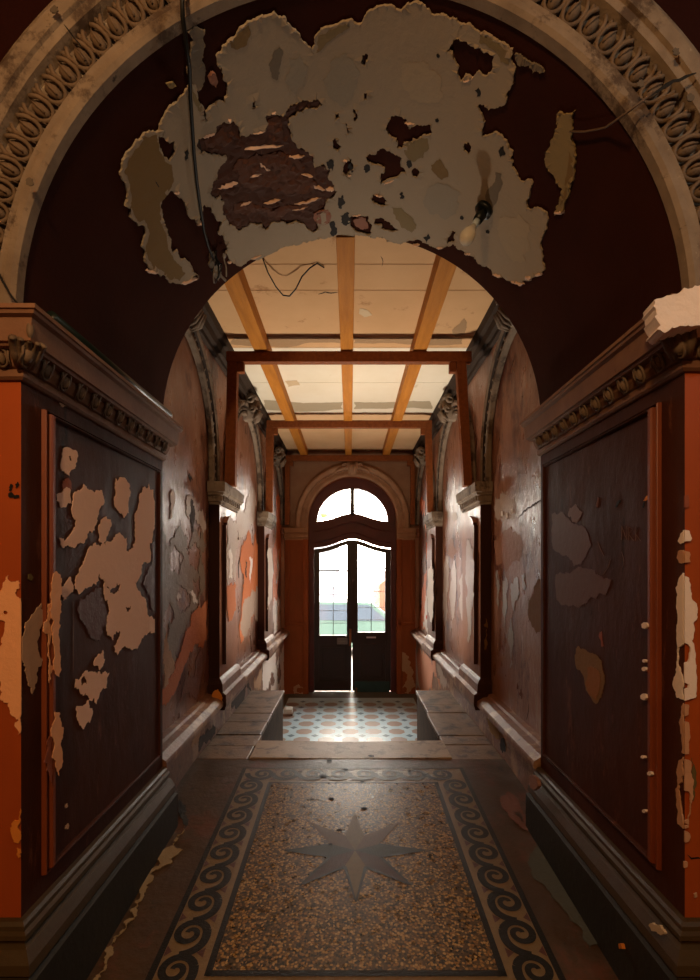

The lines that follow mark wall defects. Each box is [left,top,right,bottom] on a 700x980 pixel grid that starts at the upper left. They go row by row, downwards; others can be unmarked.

flaking render [186,26,206,92]
peeling [514,52,545,74]
spalling [185,99,370,237]
peeling [492,273,543,286]
flaking render [0,447,208,734]
peeling [226,485,281,642]
peeling [551,504,611,608]
peeling [575,631,605,704]
flaking render [672,530,698,843]
flaking render [50,712,64,775]